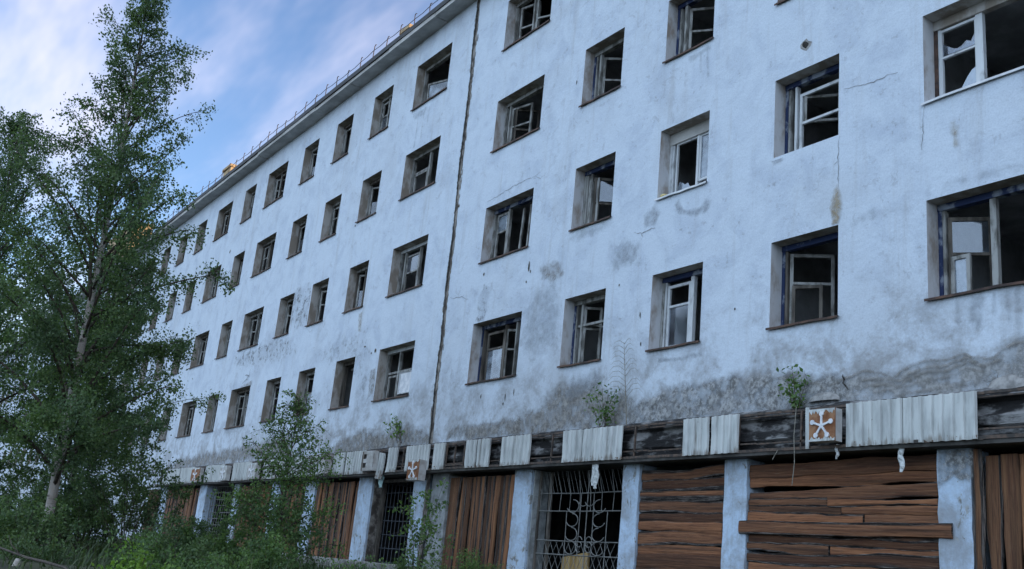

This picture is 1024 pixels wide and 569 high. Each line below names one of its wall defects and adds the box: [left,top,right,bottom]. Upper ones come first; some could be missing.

leakage [840,342,1024,401]
leakage [170,437,290,469]
leakage [329,425,429,454]